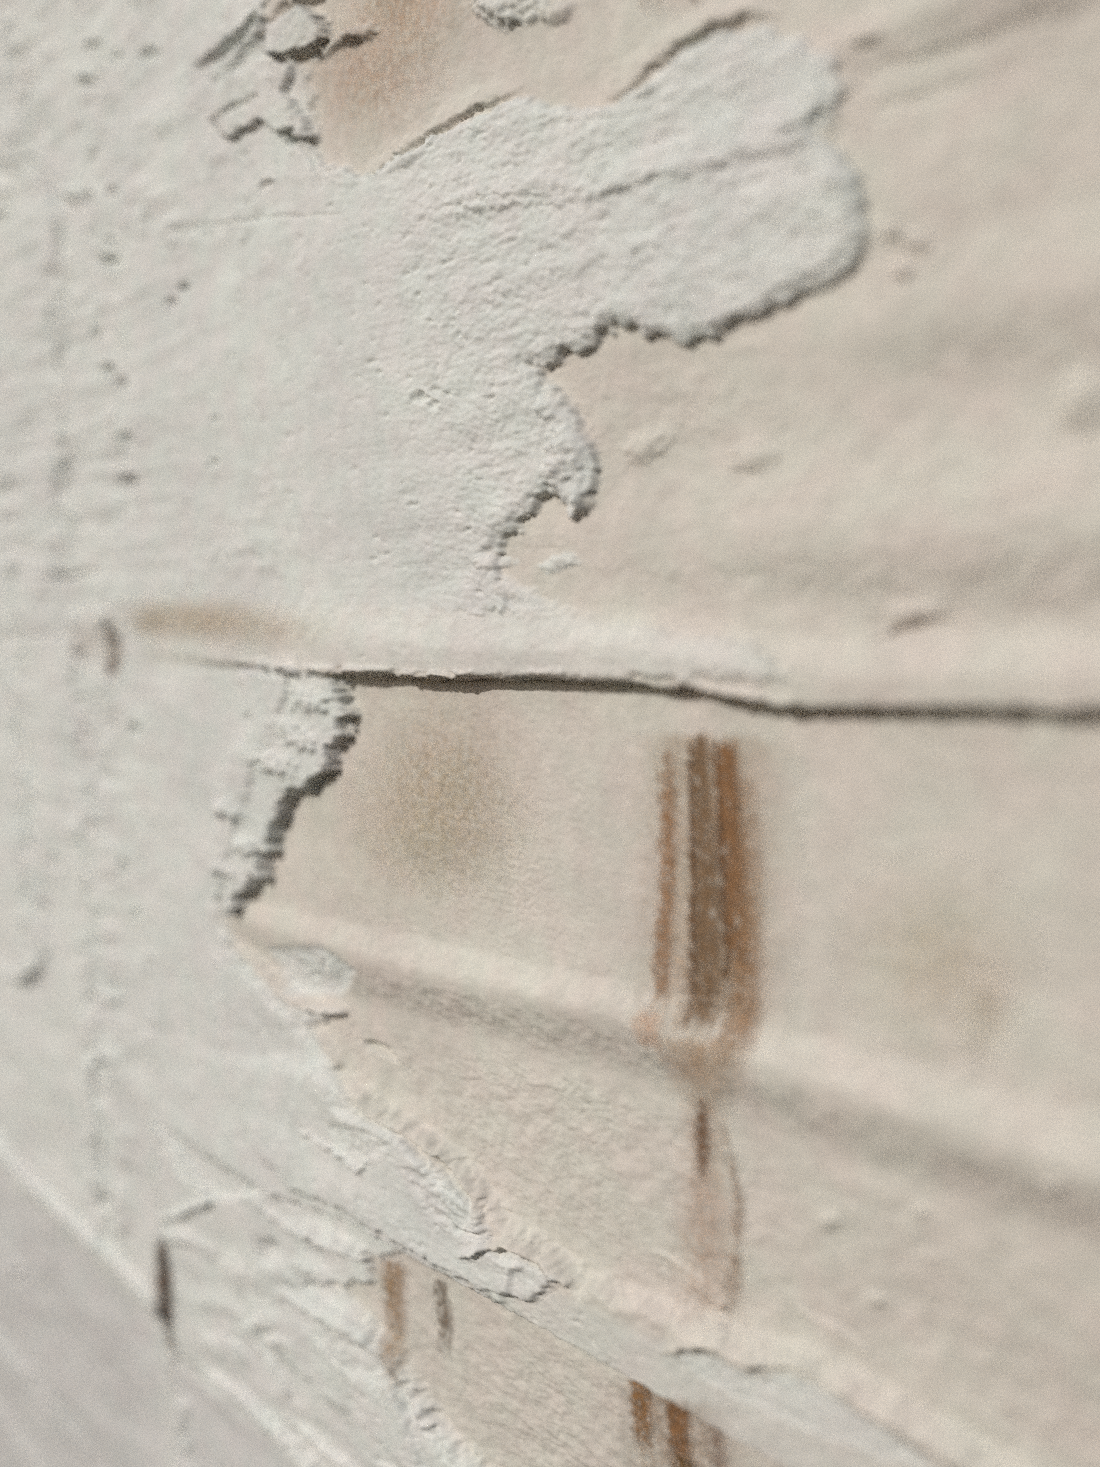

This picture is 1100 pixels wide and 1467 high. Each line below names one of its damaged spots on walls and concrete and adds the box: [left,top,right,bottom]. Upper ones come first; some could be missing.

flaking render [97,0,880,622]
flaking render [146,659,574,1467]
rust [697,1105,707,1166]
rust [655,737,755,1076]
rust [632,1381,716,1467]
flaking render [661,1323,967,1467]